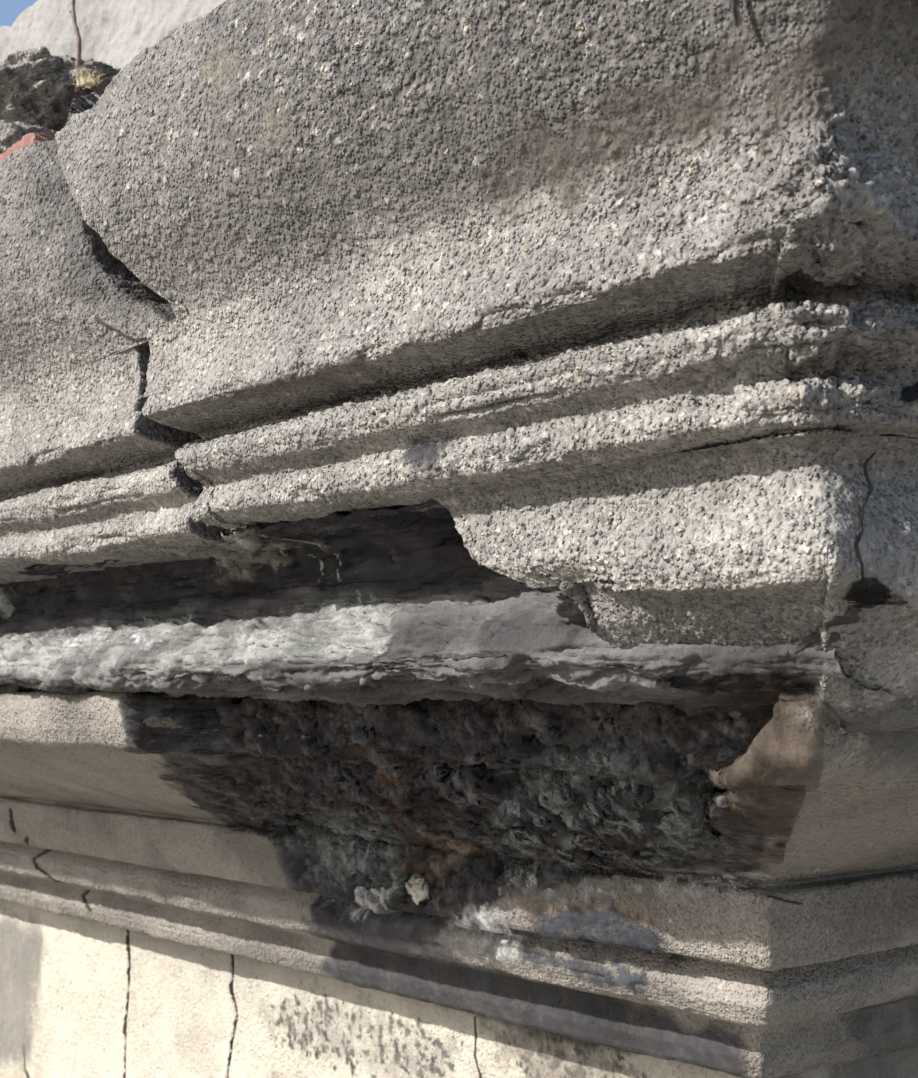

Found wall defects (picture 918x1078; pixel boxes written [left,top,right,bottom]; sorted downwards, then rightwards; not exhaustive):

crack [730,0,738,26]
crack [95,316,147,342]
spalling [120,688,804,922]
water stain [448,911,536,960]
crack [123,930,131,1078]
crack [227,954,238,1078]
water stain [265,994,463,1078]
crack [474,1016,482,1078]
water stain [495,1031,645,1078]